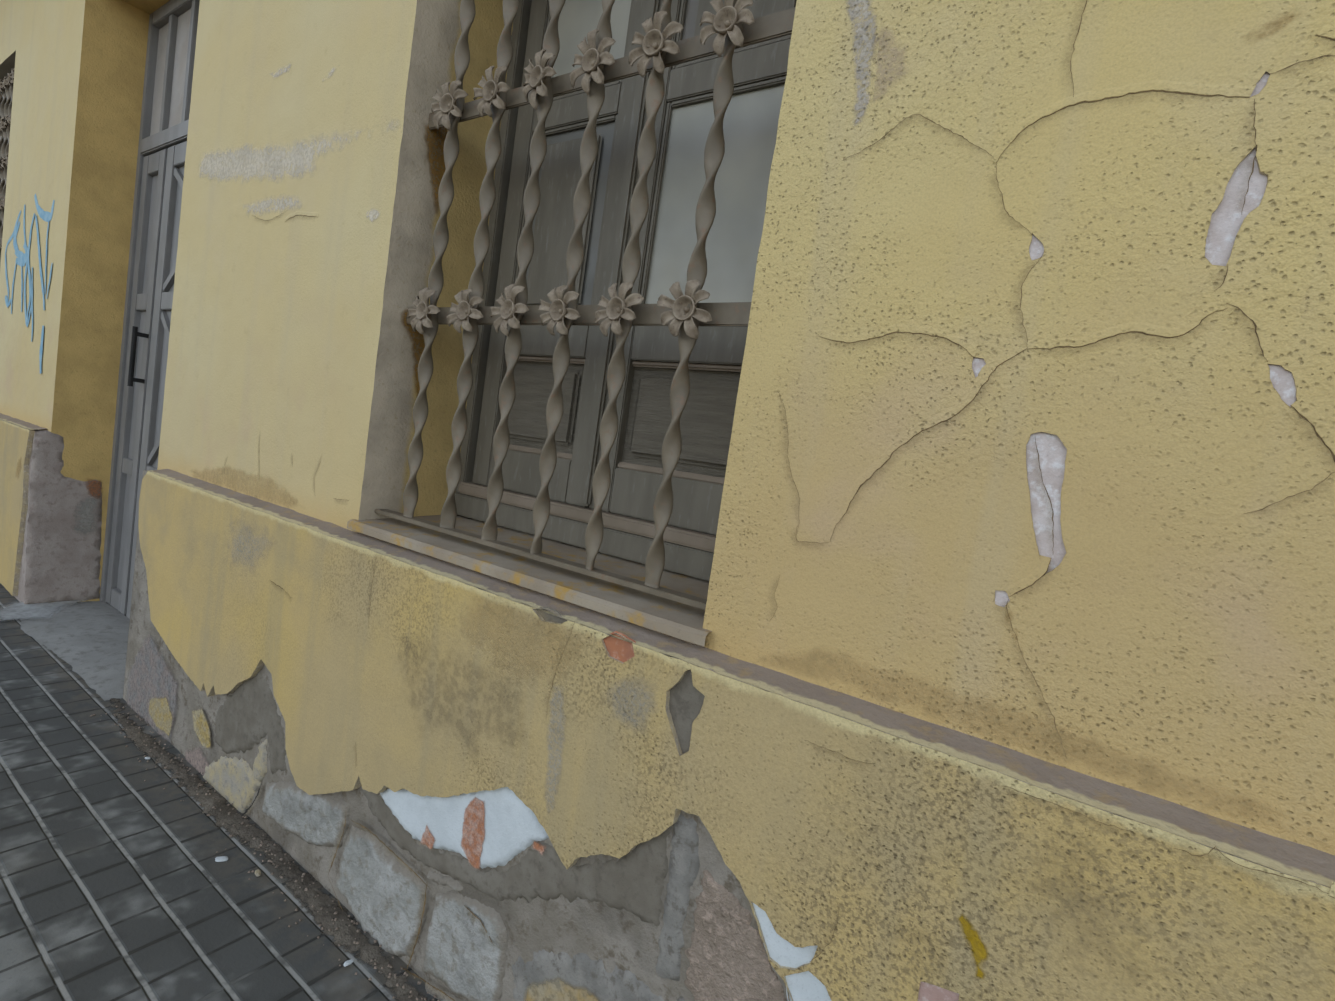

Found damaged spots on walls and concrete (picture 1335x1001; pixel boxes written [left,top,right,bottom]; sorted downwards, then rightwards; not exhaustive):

crack [780,0,1335,543]
peeling [1205,145,1268,266]
peeling [24,430,102,604]
peeling [1026,432,1067,574]
flaking render [127,638,177,741]
peeling [601,631,636,664]
crack [1004,555,1067,758]
flaking render [185,669,831,1001]
peeling [917,981,959,1001]